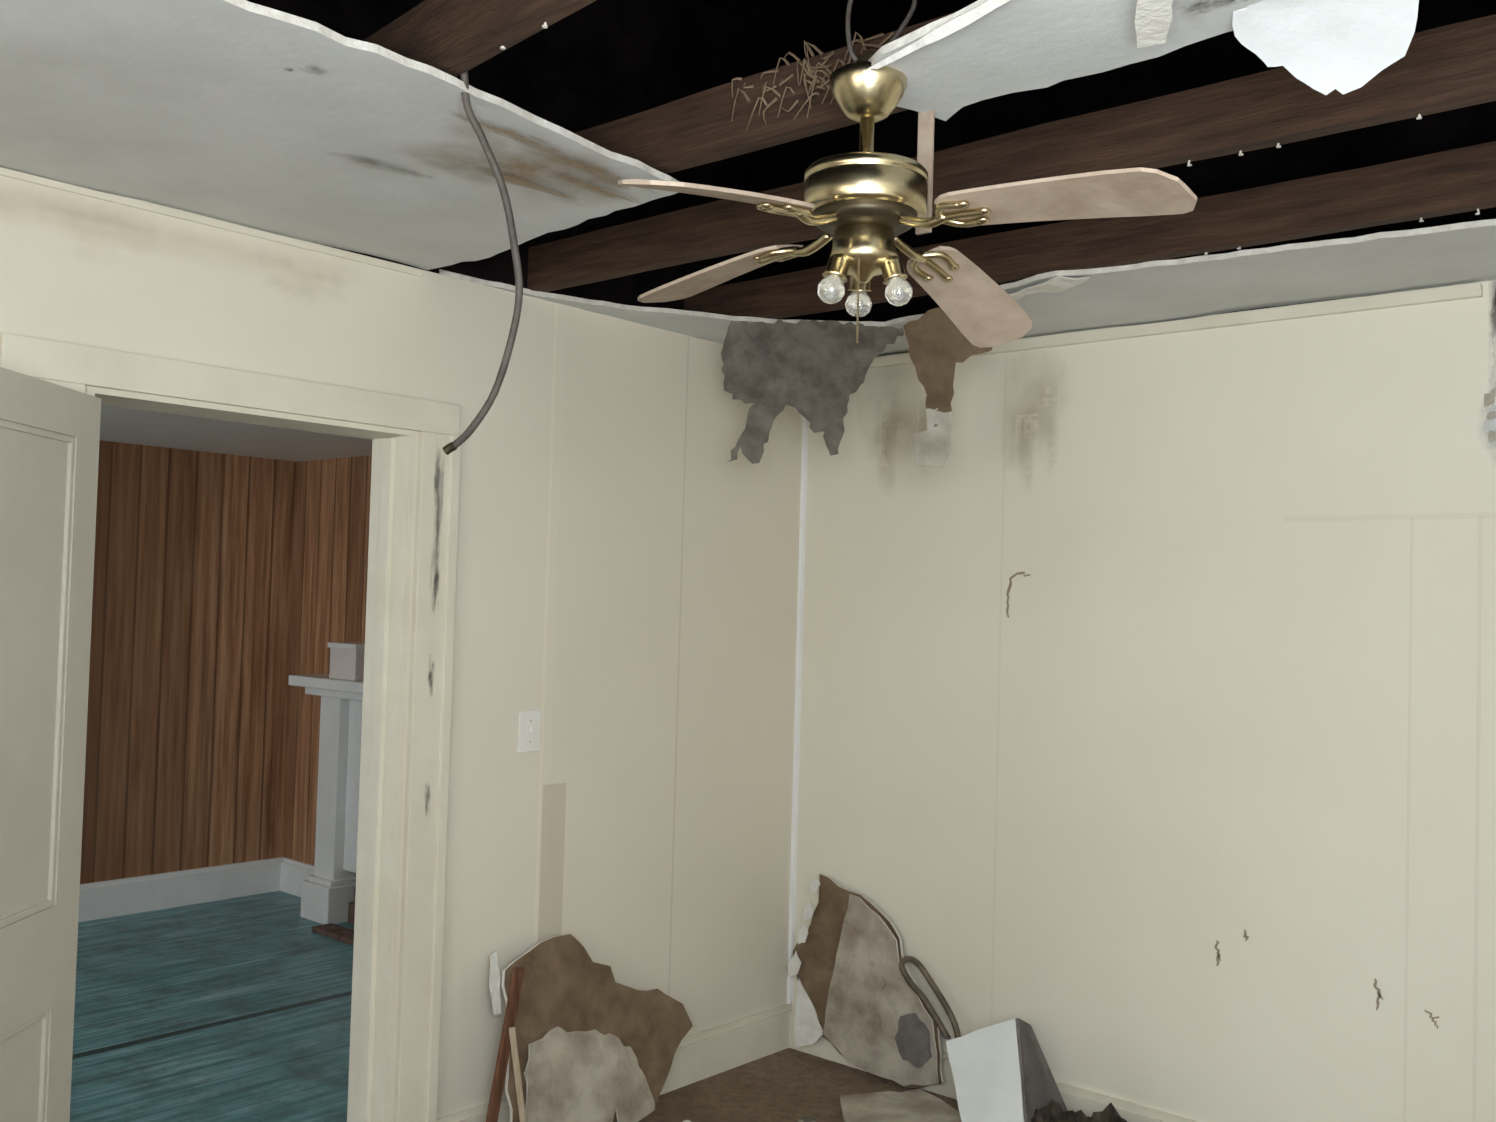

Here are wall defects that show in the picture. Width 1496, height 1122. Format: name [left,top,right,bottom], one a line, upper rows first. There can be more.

peeling [1484,280,1496,442]
crack [1006,572,1030,618]